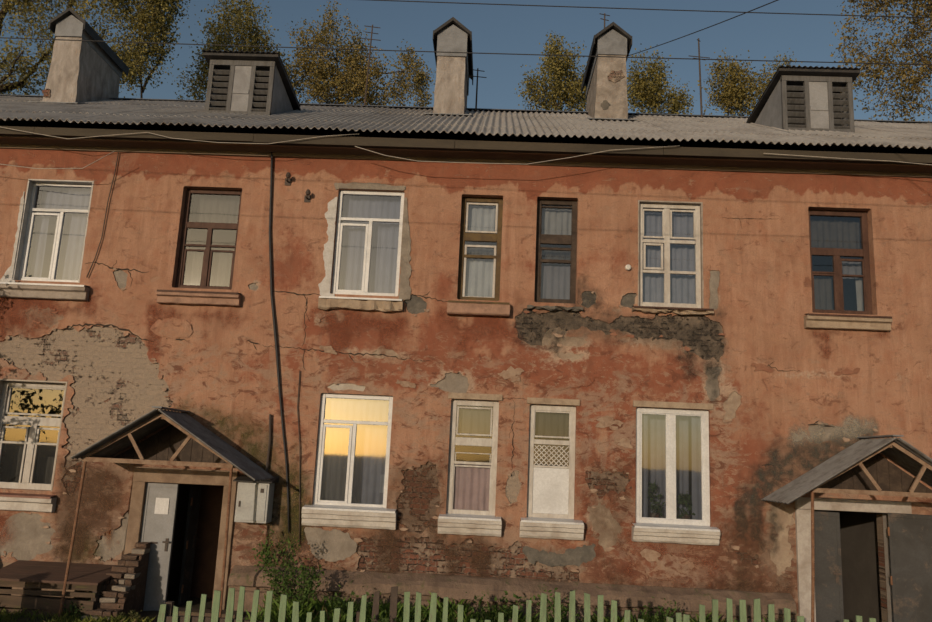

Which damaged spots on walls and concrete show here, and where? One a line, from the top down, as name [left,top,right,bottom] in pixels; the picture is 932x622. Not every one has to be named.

crack [86,260,146,284]
crack [247,291,429,371]
flaking render [514,270,741,423]
flaking render [0,326,173,494]
flaking render [354,461,580,581]
flaking render [585,469,632,552]
damp [734,417,877,562]